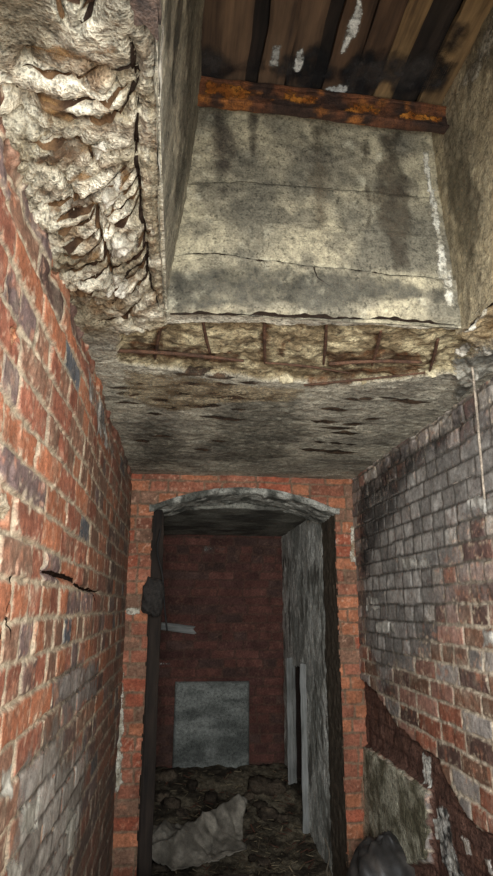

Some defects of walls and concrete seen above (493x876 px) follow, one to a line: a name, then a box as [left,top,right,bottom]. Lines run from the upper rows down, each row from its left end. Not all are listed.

leakage [272,24,466,100]
corrosion [400,111,441,122]
spalling [0,0,493,421]
crack [109,37,493,332]
leakage [365,134,408,265]
leakage [423,152,454,306]
leakage [176,268,419,309]
corrosion [131,328,238,362]
corrosion [308,334,438,386]
peeling [301,397,430,454]
crack [40,570,97,610]
spalling [366,683,493,876]